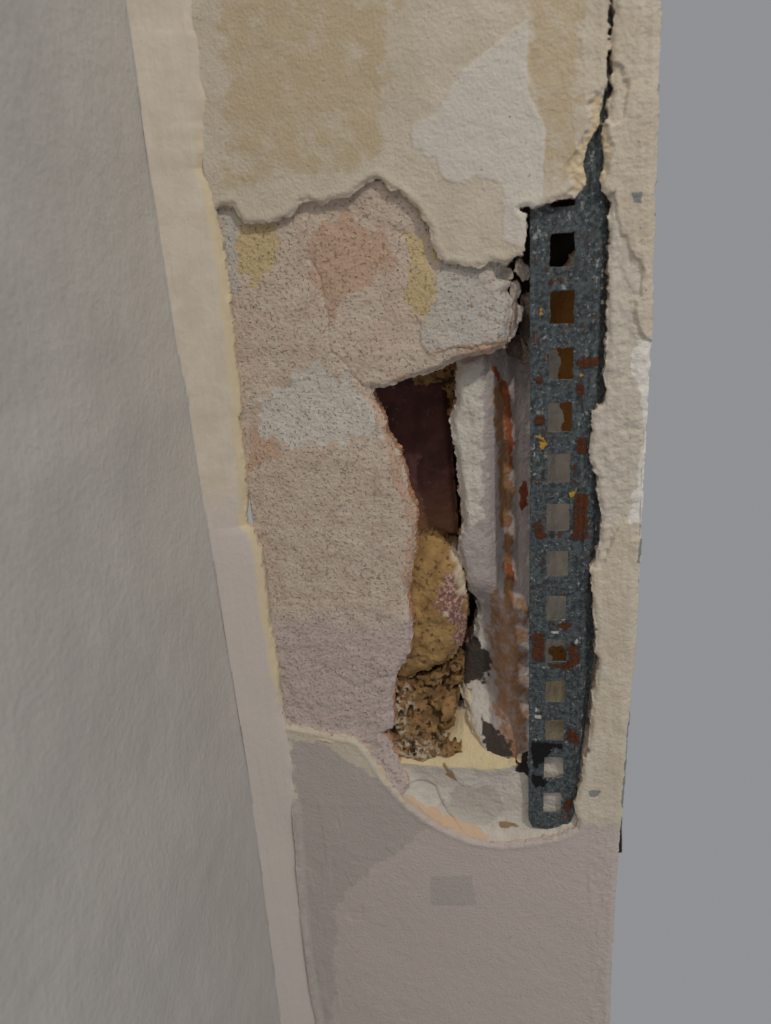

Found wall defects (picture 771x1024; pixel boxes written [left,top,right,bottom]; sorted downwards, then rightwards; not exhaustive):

rust [577,356,600,369]
flaking render [217,180,513,795]
rust [571,438,590,541]
rust [532,622,580,670]